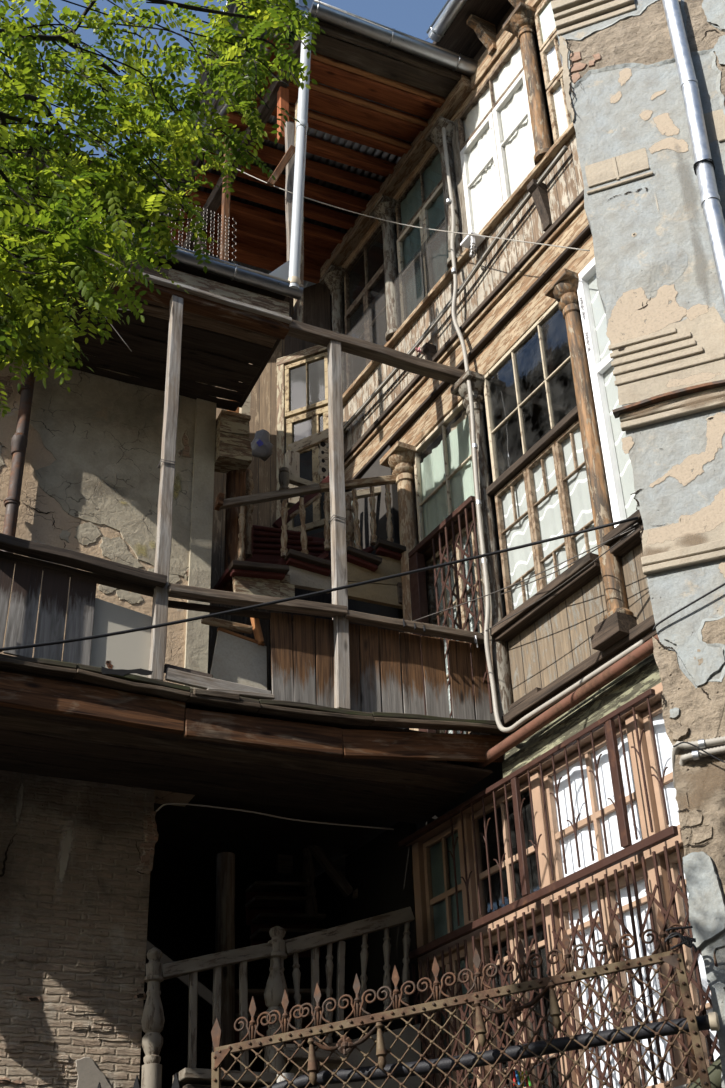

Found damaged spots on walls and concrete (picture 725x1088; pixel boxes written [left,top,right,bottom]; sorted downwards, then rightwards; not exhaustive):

flaking render [559,0,676,122]
flaking render [678,0,725,115]
peeling [640,90,688,154]
peeling [606,284,708,351]
peeling [666,372,722,388]
crack [22,495,79,549]
peeling [647,488,725,545]
flaking render [652,614,725,1088]